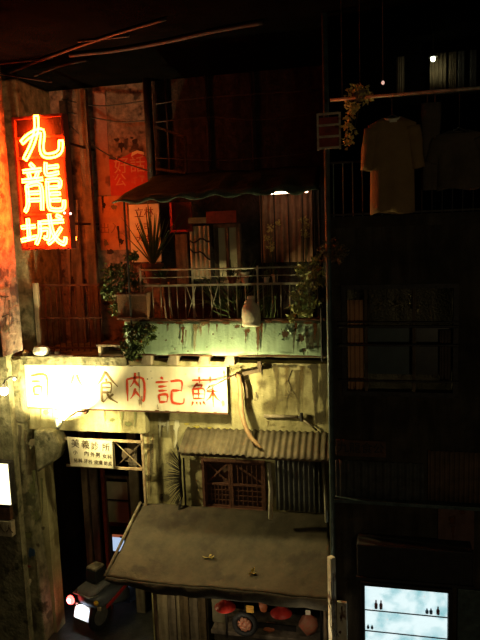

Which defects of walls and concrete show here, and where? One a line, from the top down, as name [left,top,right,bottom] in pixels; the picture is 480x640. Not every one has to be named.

corrosion [156,321,317,356]